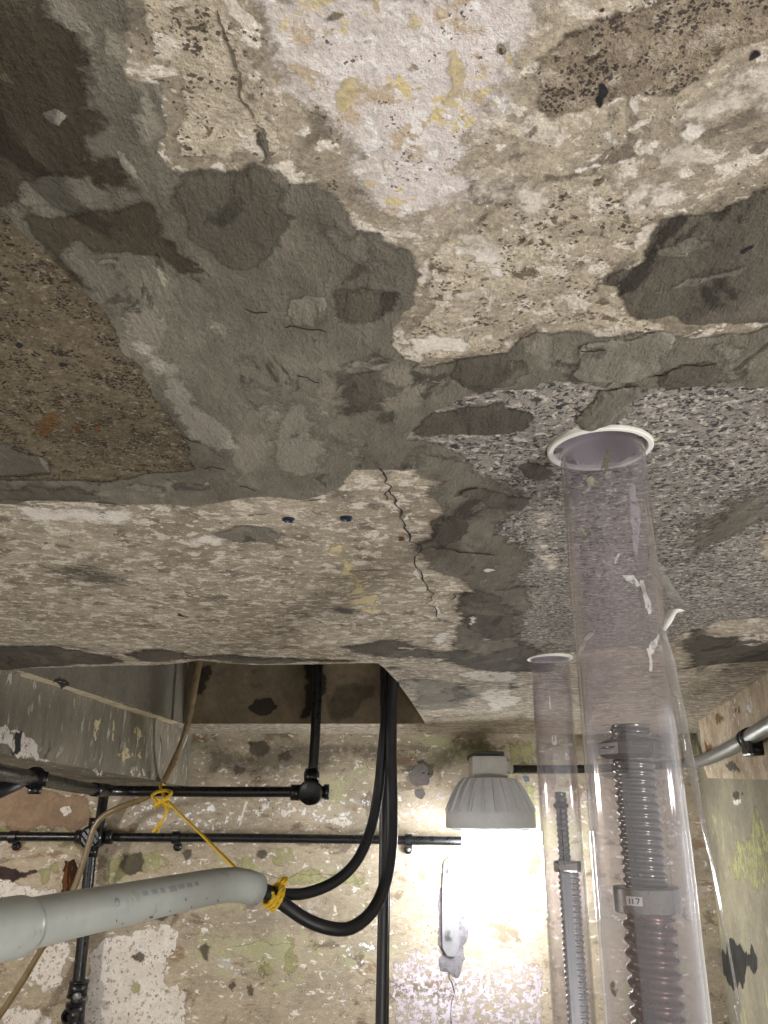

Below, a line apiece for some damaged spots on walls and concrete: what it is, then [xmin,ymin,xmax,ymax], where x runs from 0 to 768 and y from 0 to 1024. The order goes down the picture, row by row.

crack [217,10,268,159]
spalling [0,211,195,482]
crack [379,467,495,619]
spalling [413,380,768,655]
leakage [398,632,451,650]